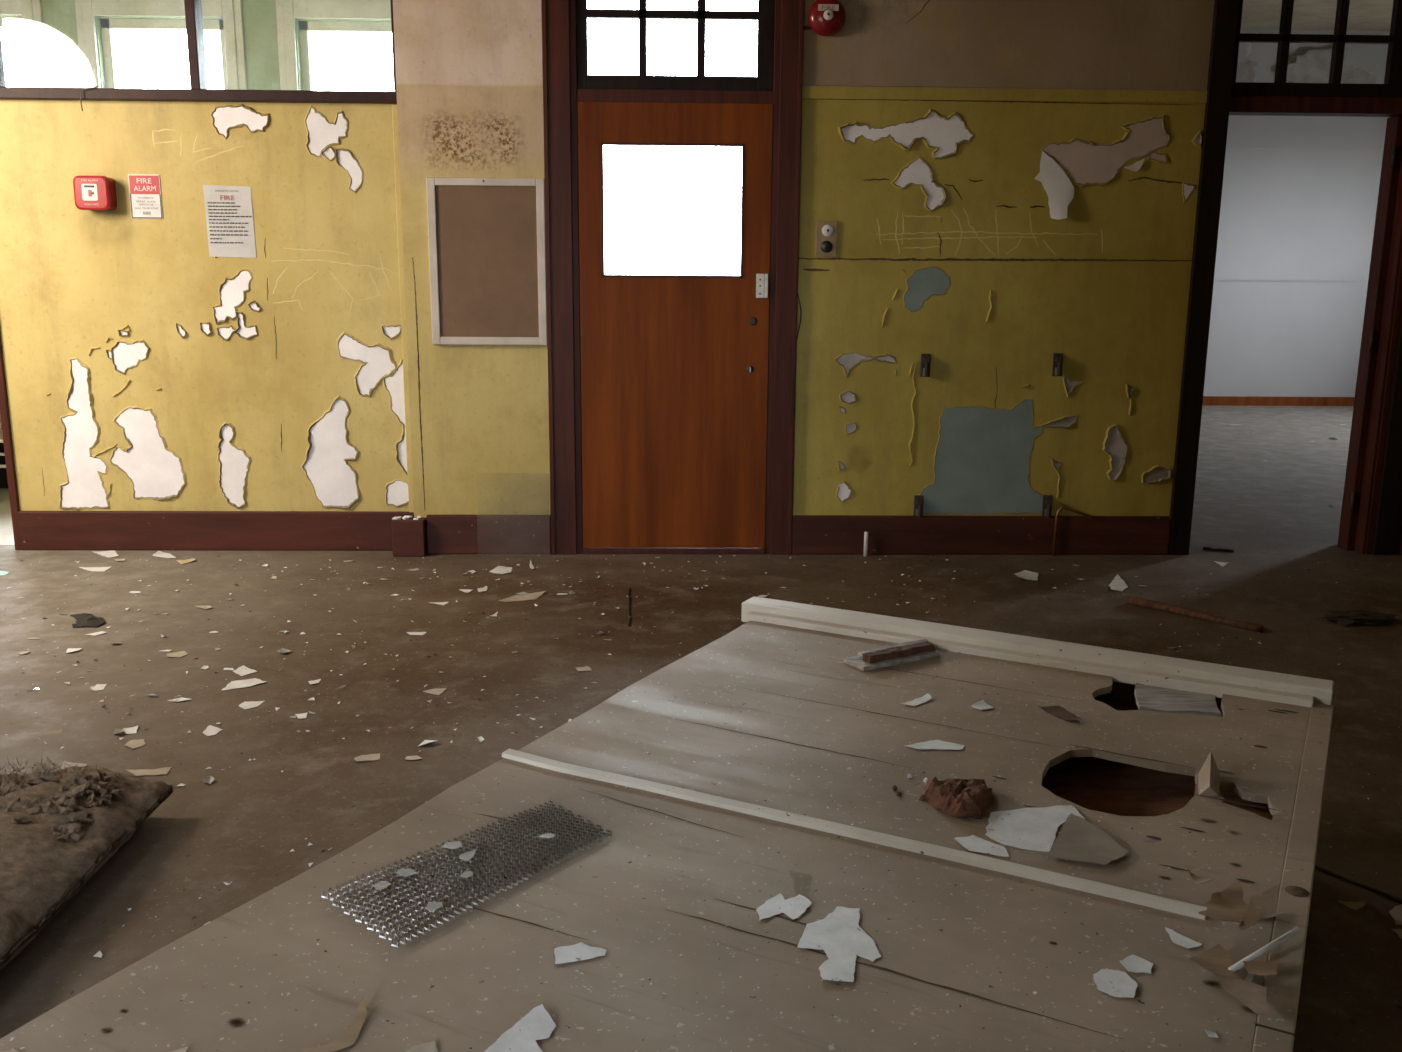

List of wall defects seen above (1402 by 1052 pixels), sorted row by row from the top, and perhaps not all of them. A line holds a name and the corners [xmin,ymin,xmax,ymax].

peeling [210,104,270,140]
peeling [304,105,364,194]
peeling [838,109,976,212]
peeling [1034,114,1171,220]
peeling [176,269,261,341]
peeling [903,266,951,313]
peeling [59,357,187,511]
peeling [106,329,150,375]
peeling [217,421,252,509]
peeling [301,324,409,510]
peeling [834,351,897,435]
peeling [919,398,1079,515]